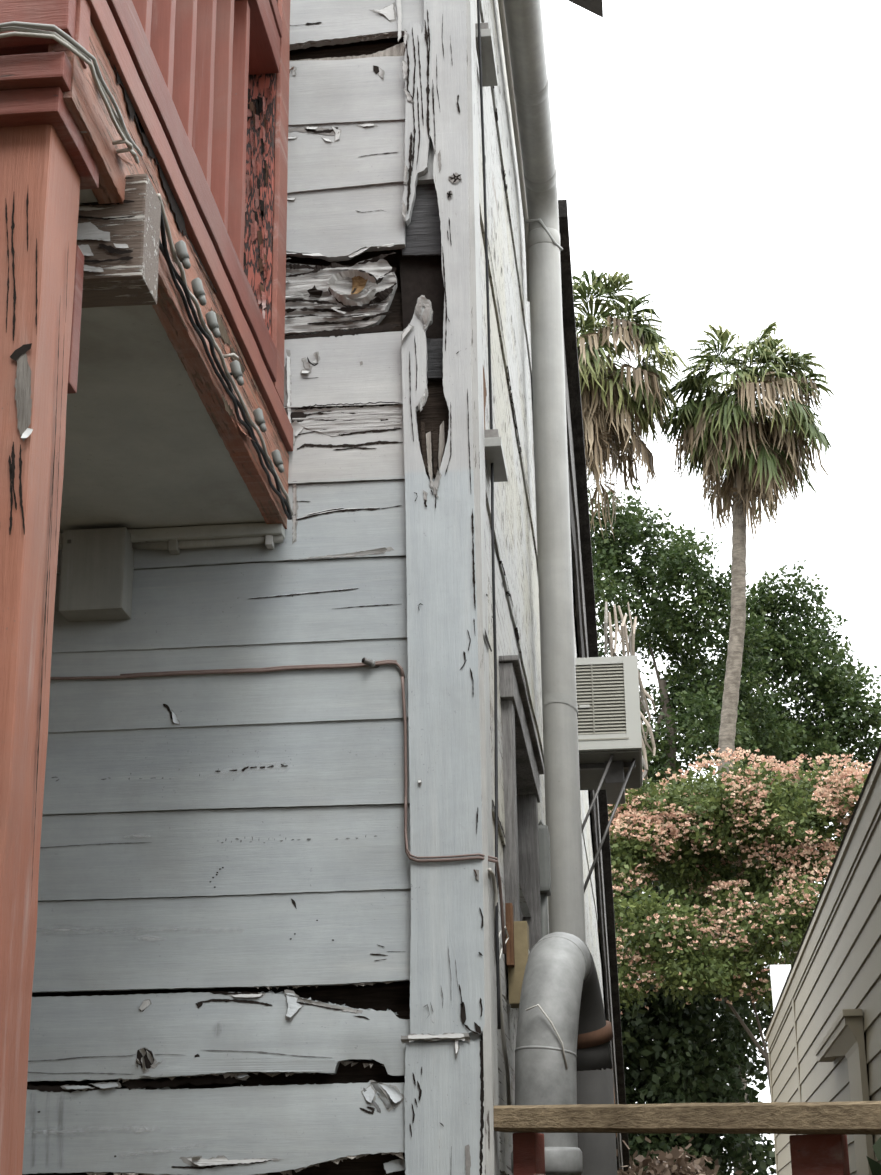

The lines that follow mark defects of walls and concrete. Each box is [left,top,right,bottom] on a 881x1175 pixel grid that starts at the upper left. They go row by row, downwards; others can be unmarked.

peeling [243,88,271,322]
peeling [77,207,129,272]
peeling [348,243,394,257]
peeling [414,484,439,509]
crack [197,991,370,1020]
crack [28,1054,176,1075]
crack [205,1050,332,1058]